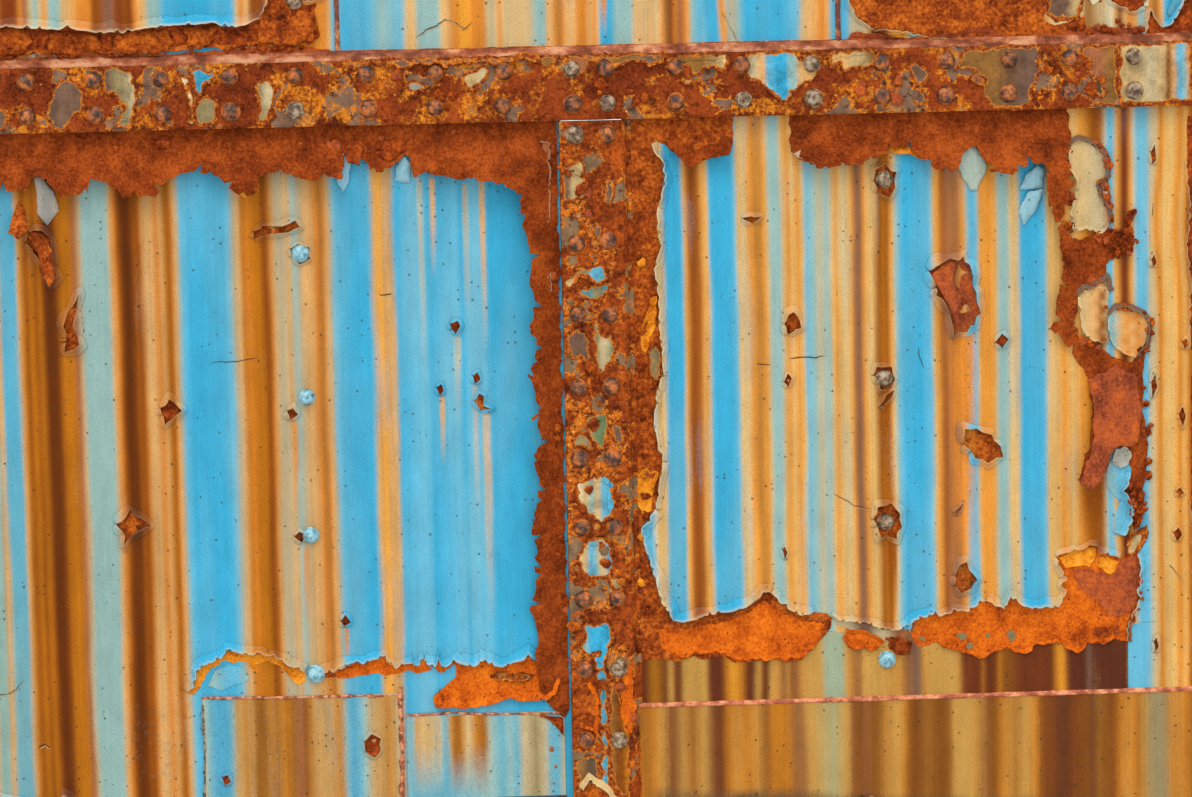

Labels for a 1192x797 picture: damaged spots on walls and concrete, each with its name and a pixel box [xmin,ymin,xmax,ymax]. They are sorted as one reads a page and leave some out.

rust [13,178,100,797]
rust [107,178,192,797]
peeling [0,0,330,61]
peeling [0,65,638,797]
peeling [342,49,733,111]
rust [681,159,714,613]
rust [639,656,810,797]
rust [735,115,808,613]
peeling [570,44,1161,663]
peeling [744,0,1192,108]
rust [830,143,1147,797]
rust [1151,106,1192,797]